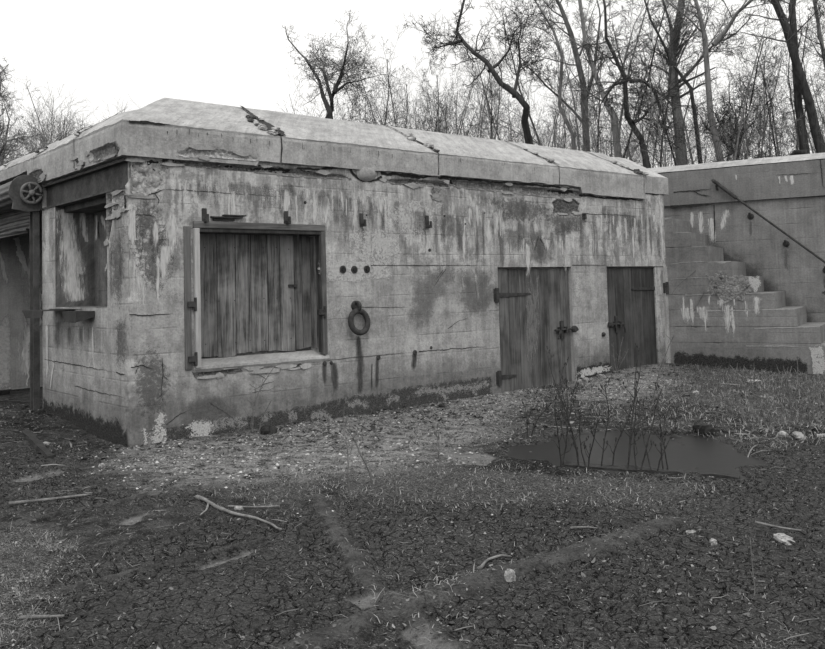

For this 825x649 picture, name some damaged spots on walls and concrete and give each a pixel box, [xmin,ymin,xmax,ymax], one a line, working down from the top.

crack [2,109,170,167]
crack [213,105,337,174]
crack [113,159,284,229]
spalling [69,142,352,308]
leakage [205,182,442,262]
spalling [379,178,584,235]
efflorescence [690,210,729,241]
efflorescence [128,211,179,304]
spalling [116,319,126,364]
leakage [681,295,735,331]
leakage [415,381,489,400]
efflorescence [141,412,167,445]